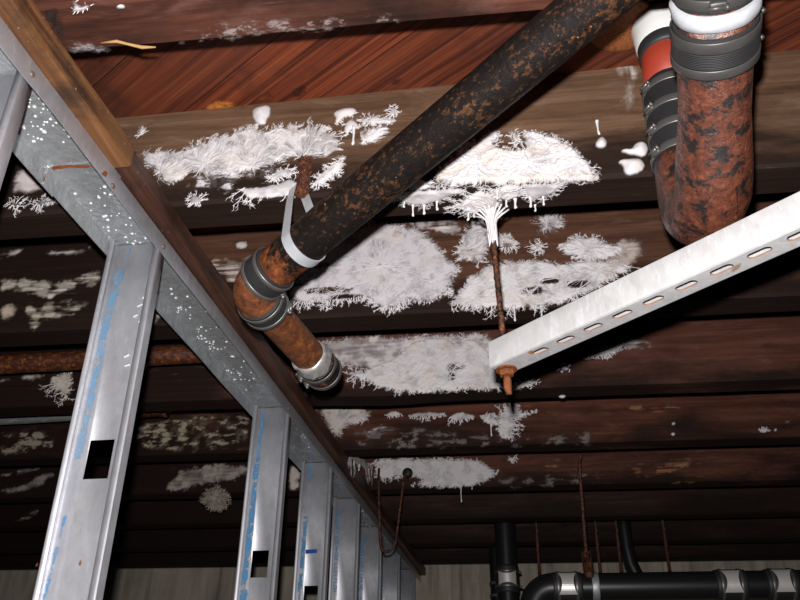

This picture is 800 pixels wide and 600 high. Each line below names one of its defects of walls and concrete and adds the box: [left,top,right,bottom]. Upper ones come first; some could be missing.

water stain [14,169,44,192]
water stain [606,240,640,265]
water stain [1,273,99,328]
water stain [316,406,502,448]
water stain [167,464,247,491]